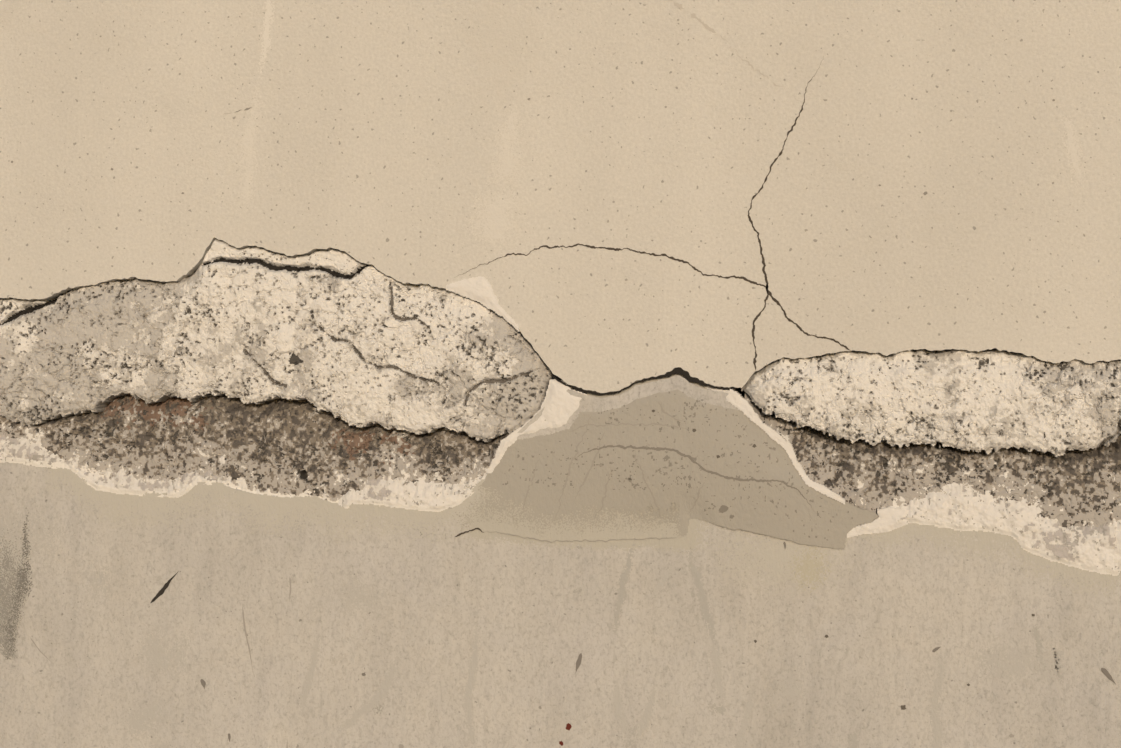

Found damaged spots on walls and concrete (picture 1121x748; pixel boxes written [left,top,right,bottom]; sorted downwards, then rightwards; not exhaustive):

crack [454,2,849,406]
spalling [0,239,587,512]
crack [317,326,440,386]
leakage [0,467,1121,704]
crack [575,445,812,507]
spalling [704,348,1121,576]